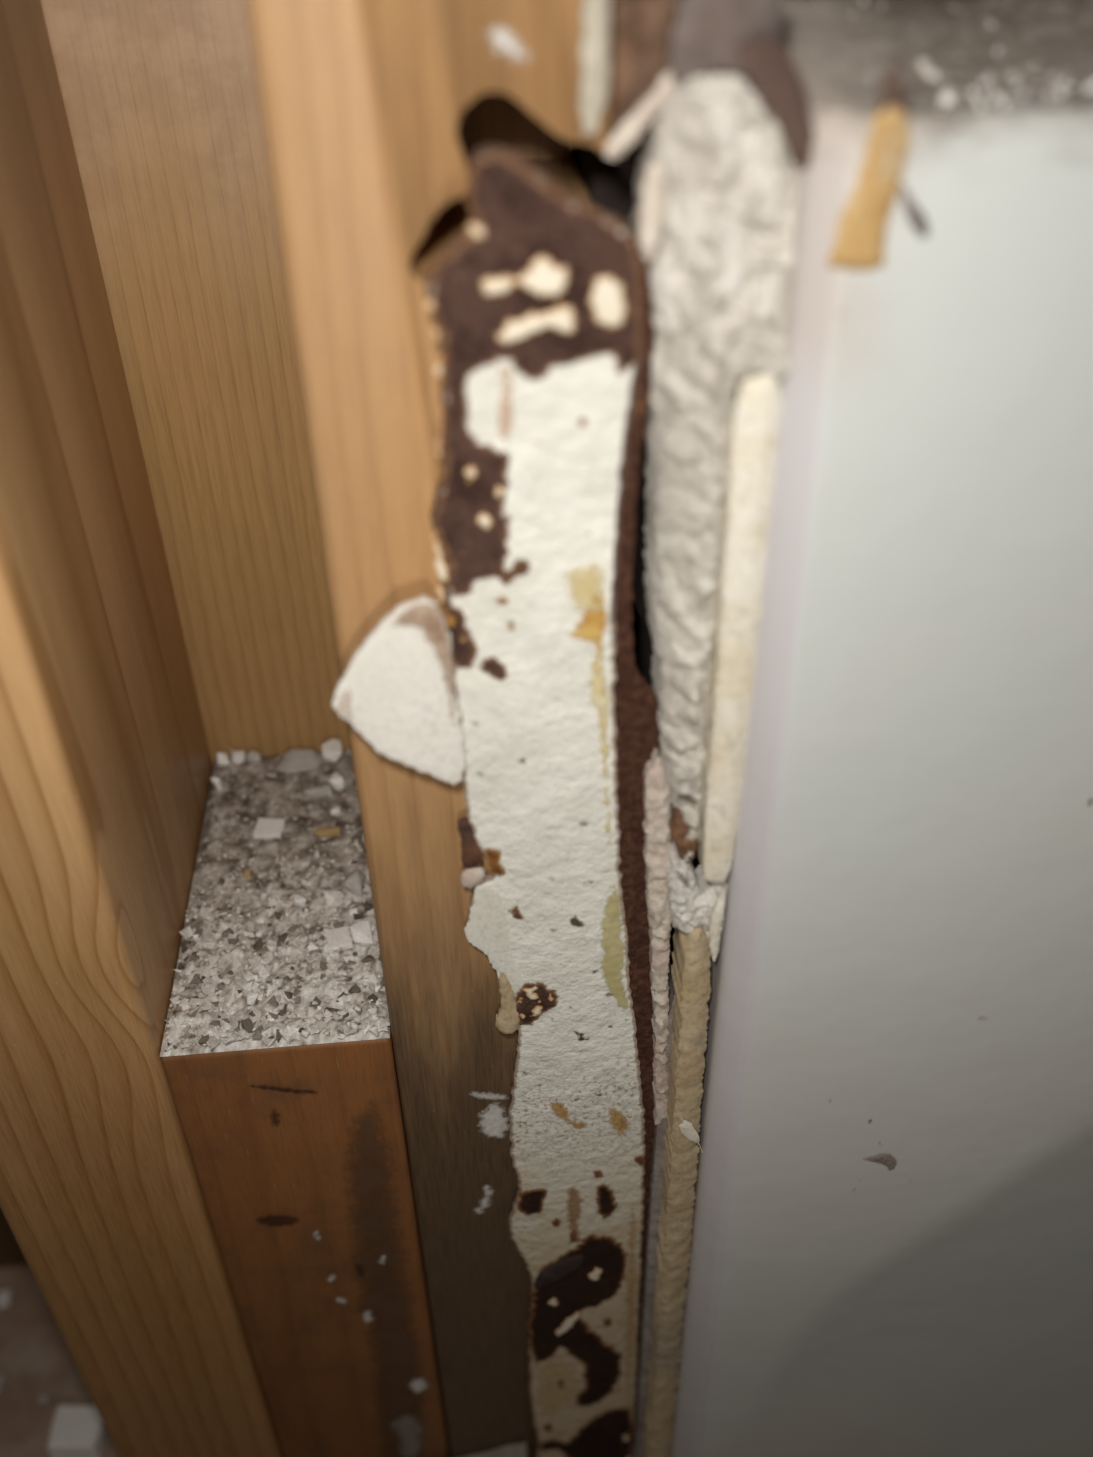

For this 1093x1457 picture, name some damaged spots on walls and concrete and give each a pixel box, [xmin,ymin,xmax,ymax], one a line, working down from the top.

spalling [631,68,798,862]
peeling [332,596,482,785]
spalling [325,891,344,908]
peeling [457,817,526,992]